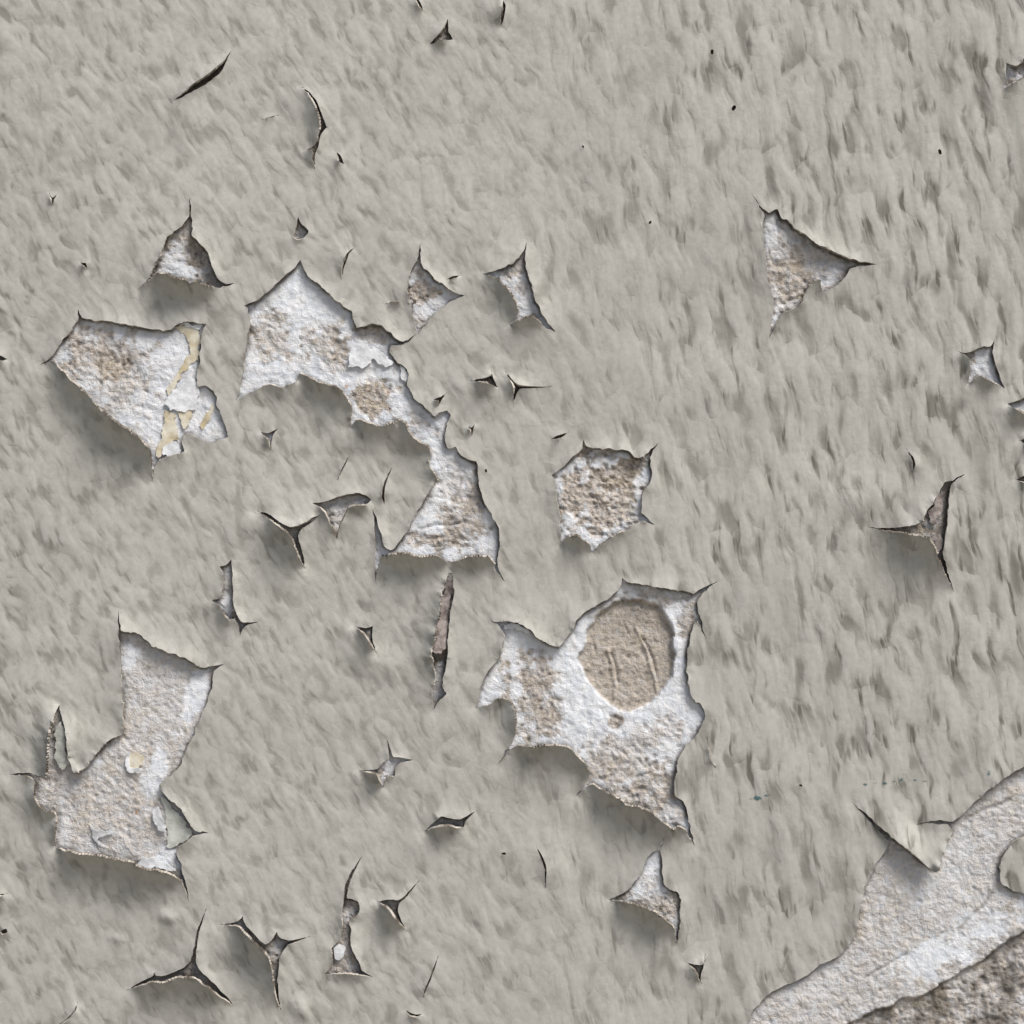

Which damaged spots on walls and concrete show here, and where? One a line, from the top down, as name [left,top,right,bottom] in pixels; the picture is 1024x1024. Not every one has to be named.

peeling [27,199,235,495]
peeling [232,218,510,594]
peeling [473,246,554,339]
peeling [753,199,876,335]
peeling [951,339,1024,433]
peeling [203,561,257,635]
peeling [546,439,659,562]
peeling [852,470,964,608]
peeling [0,610,223,917]
peeling [467,571,716,955]
peeling [323,858,370,985]
peeling [715,732,1024,1024]